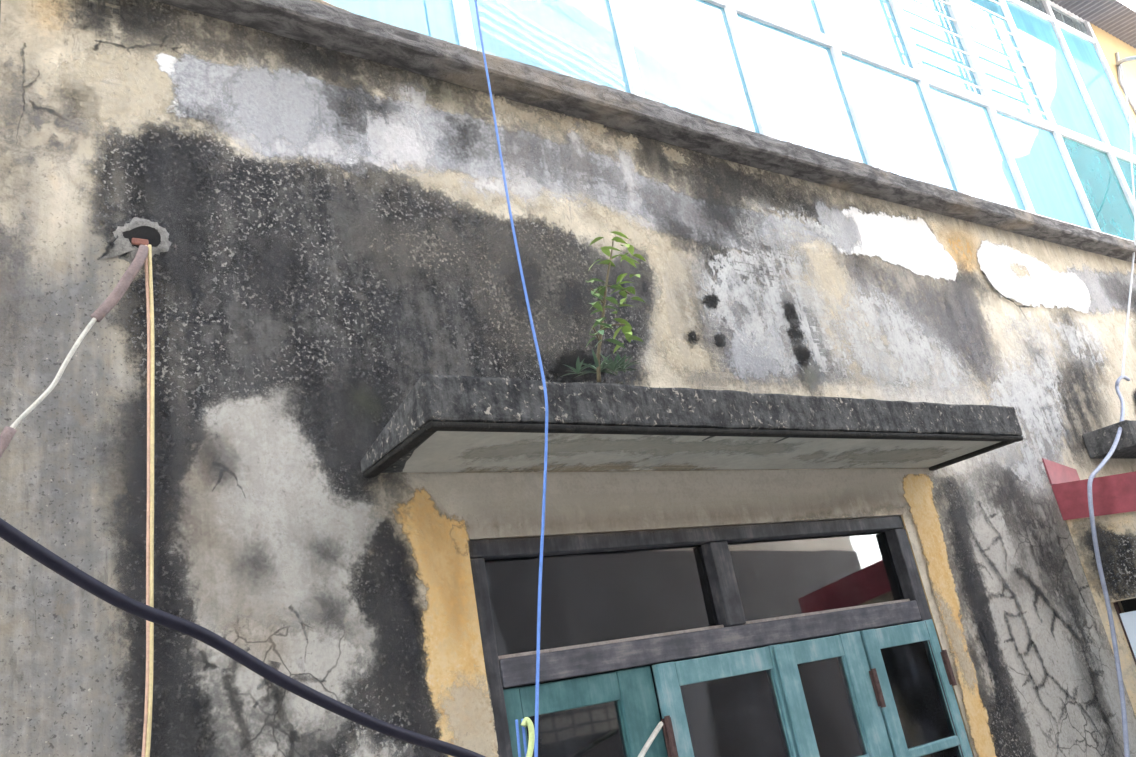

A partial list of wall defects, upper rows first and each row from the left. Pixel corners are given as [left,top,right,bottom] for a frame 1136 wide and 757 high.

water stain [69,0,495,121]
peeling [59,50,971,390]
water stain [587,129,916,226]
water stain [1105,280,1136,309]
crack [200,606,317,757]
water stain [81,121,654,757]
water stain [931,475,1037,757]
crack [967,501,1114,756]
flaking render [959,240,1136,757]
water stain [983,312,1117,757]
water stain [1080,525,1136,600]